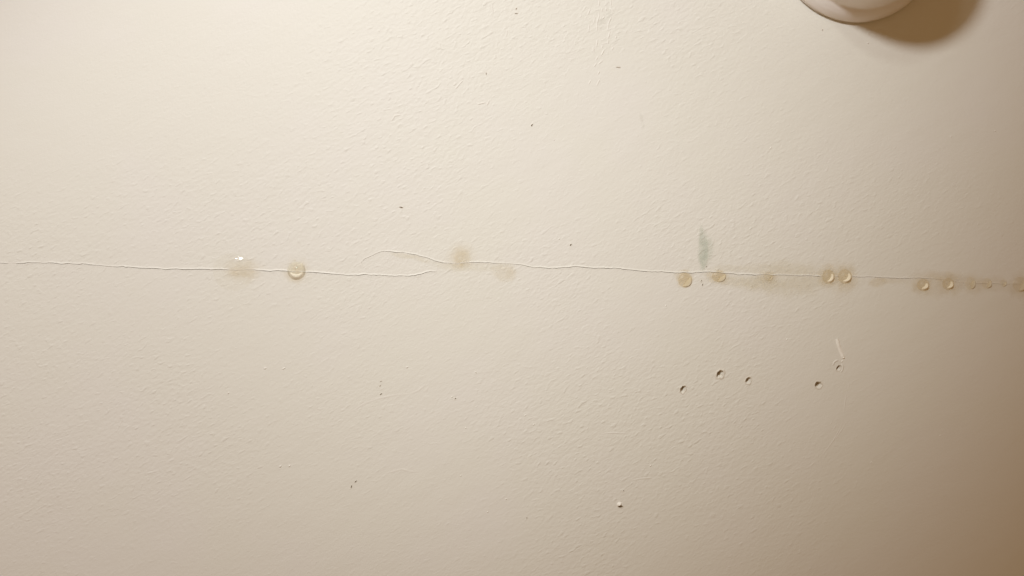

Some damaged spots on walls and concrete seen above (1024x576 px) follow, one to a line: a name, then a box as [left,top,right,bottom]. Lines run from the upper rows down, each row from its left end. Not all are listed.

crack [0,249,1022,286]